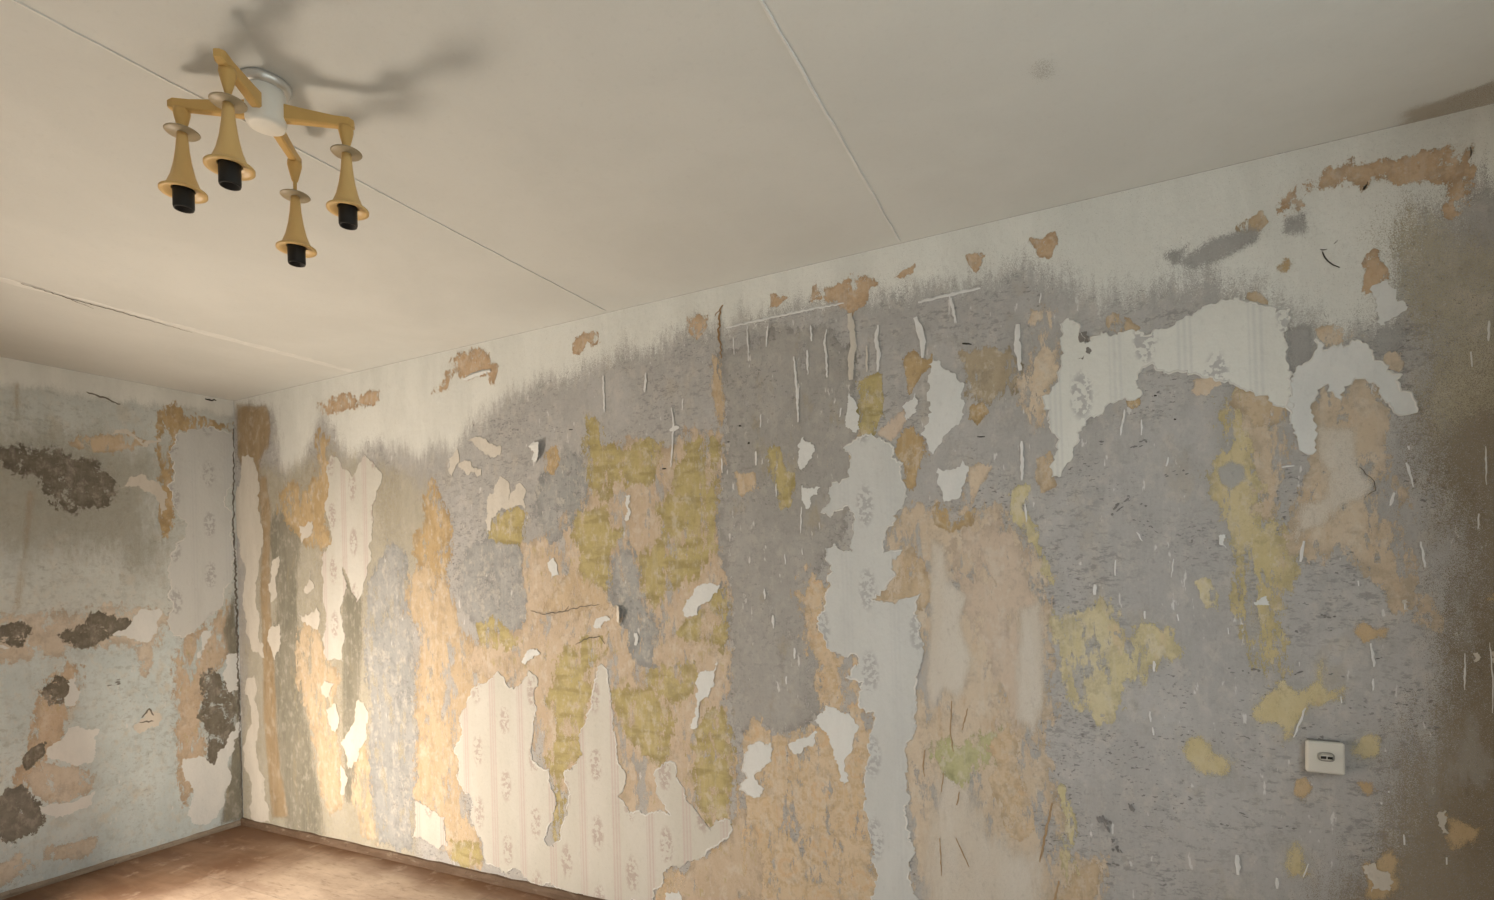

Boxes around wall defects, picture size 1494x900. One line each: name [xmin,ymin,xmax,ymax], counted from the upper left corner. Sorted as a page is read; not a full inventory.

flaking render [1235,137,1484,233]
leakage [726,302,881,422]
leakage [913,287,980,358]
leakage [1014,324,1022,371]
leakage [0,387,177,608]
flaking render [0,399,234,539]
flaking render [275,389,380,556]
leakage [669,399,683,467]
flaking render [797,394,918,509]
flaking render [0,594,241,887]
flaking render [267,571,379,846]
flaking render [873,462,1119,900]